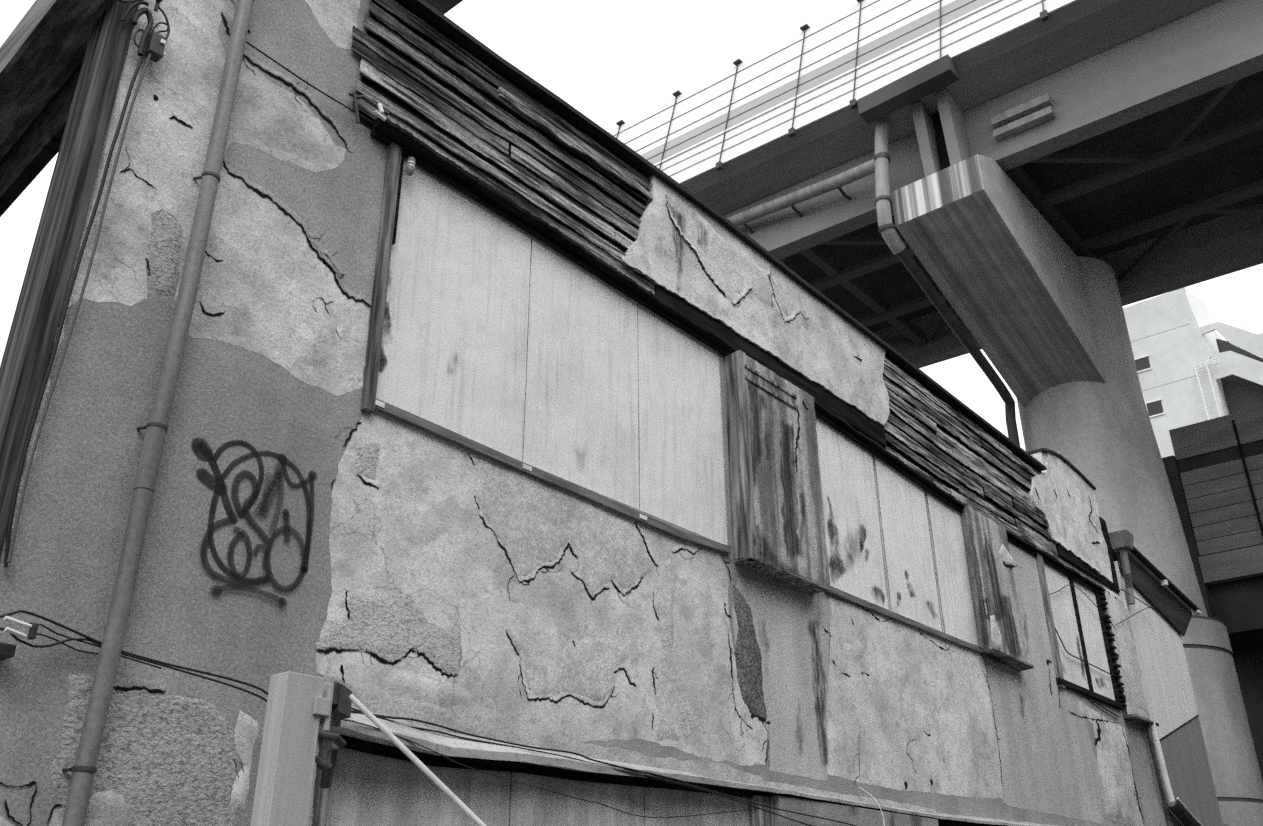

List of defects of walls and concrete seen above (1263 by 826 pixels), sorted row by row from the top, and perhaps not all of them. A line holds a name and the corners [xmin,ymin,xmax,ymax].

spalling [146,210,182,296]
crack [223,157,372,339]
crack [666,194,810,323]
damp [828,497,868,579]
crack [316,590,462,683]
crack [468,452,771,762]
spalling [733,585,767,720]
crack [0,781,63,826]
spalling [50,673,93,816]
spalling [85,688,258,826]